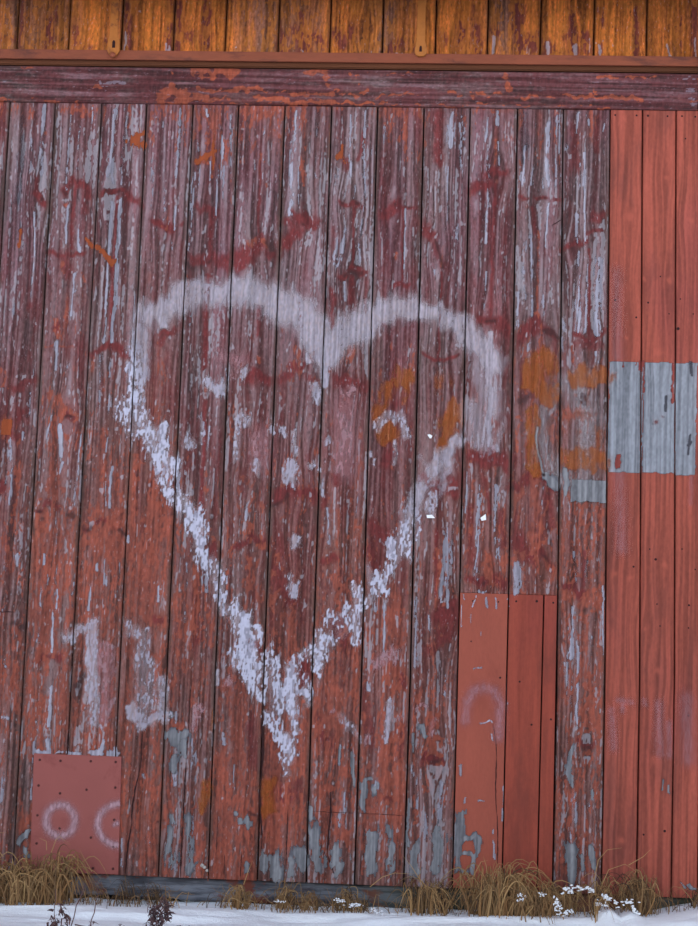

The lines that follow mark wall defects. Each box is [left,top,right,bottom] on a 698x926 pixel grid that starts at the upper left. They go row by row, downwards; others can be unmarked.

peeling [446,112,466,173]
peeling [519,114,568,188]
peeling [102,197,122,344]
peeling [561,152,604,349]
peeling [46,415,64,474]
peeling [461,476,522,627]
peeling [564,606,580,729]
peeling [30,685,120,800]
peeling [244,805,352,886]
peeling [338,745,379,827]
peeling [406,765,482,881]
peeling [563,743,597,887]